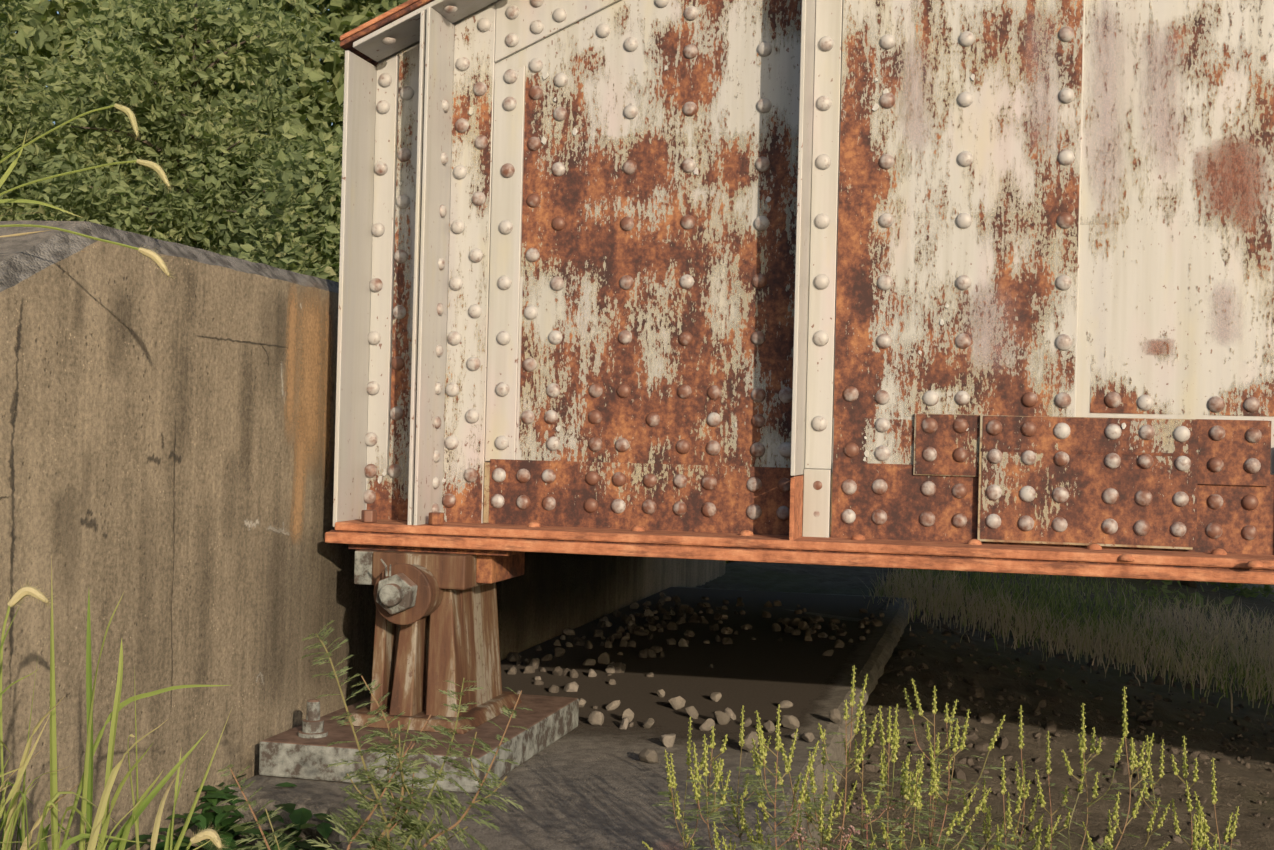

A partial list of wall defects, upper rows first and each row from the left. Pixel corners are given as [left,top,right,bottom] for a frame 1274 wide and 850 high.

corrosion [367,49,416,520]
corrosion [442,0,802,536]
corrosion [831,0,1274,555]